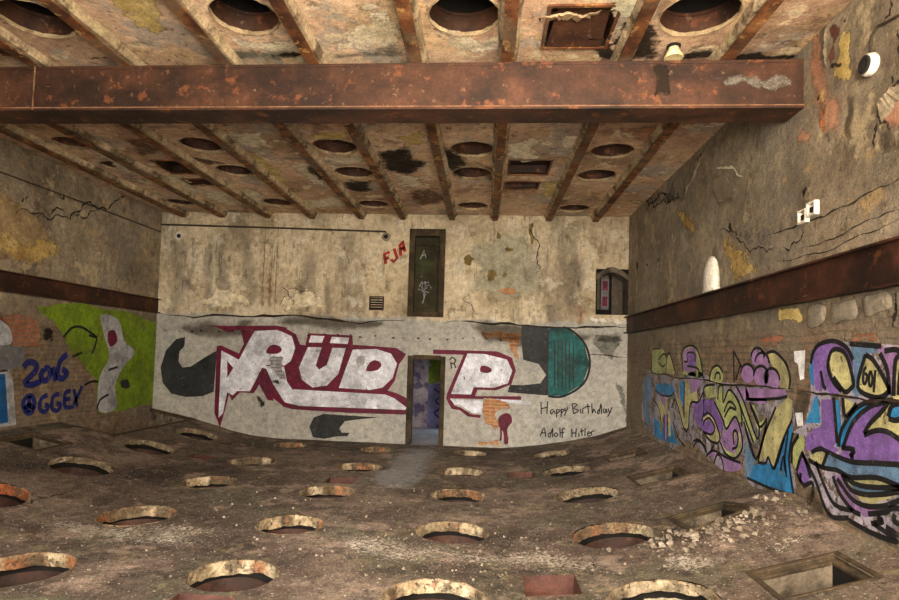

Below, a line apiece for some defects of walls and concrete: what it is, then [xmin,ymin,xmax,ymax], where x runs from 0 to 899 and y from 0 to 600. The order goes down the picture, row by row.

peeling [109,0,164,34]
corrosion [724,75,791,89]
peeling [811,19,852,132]
flaking render [872,80,899,150]
flaking render [0,185,59,265]
crack [16,195,126,220]
crack [763,179,899,264]
corrosion [778,308,803,322]